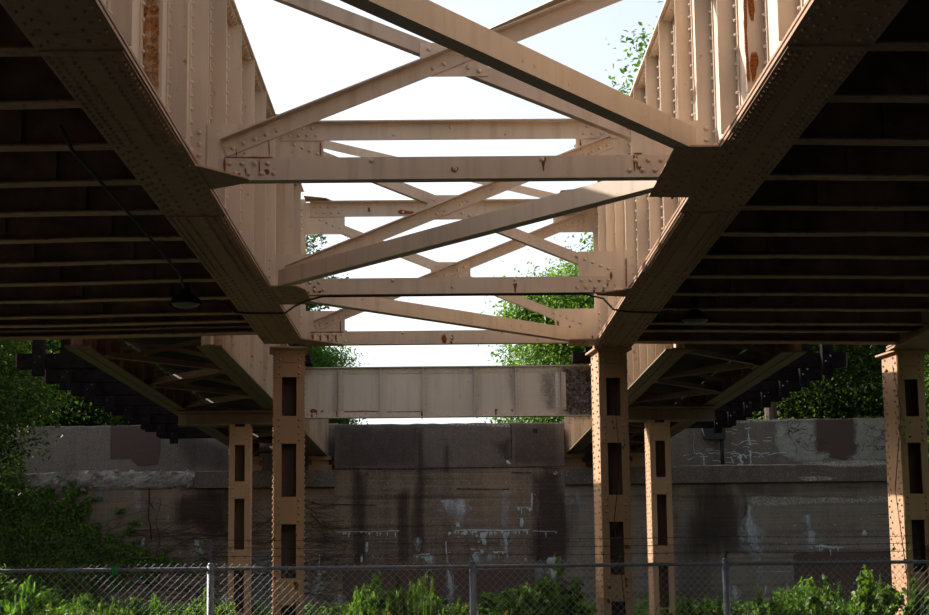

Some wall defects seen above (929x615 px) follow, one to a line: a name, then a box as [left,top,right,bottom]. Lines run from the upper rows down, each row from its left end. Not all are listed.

corrosion [143,0,159,91]
corrosion [743,0,759,81]
spalling [53,469,195,491]
water stain [339,443,433,564]
water stain [441,472,566,578]
water stain [805,515,843,556]